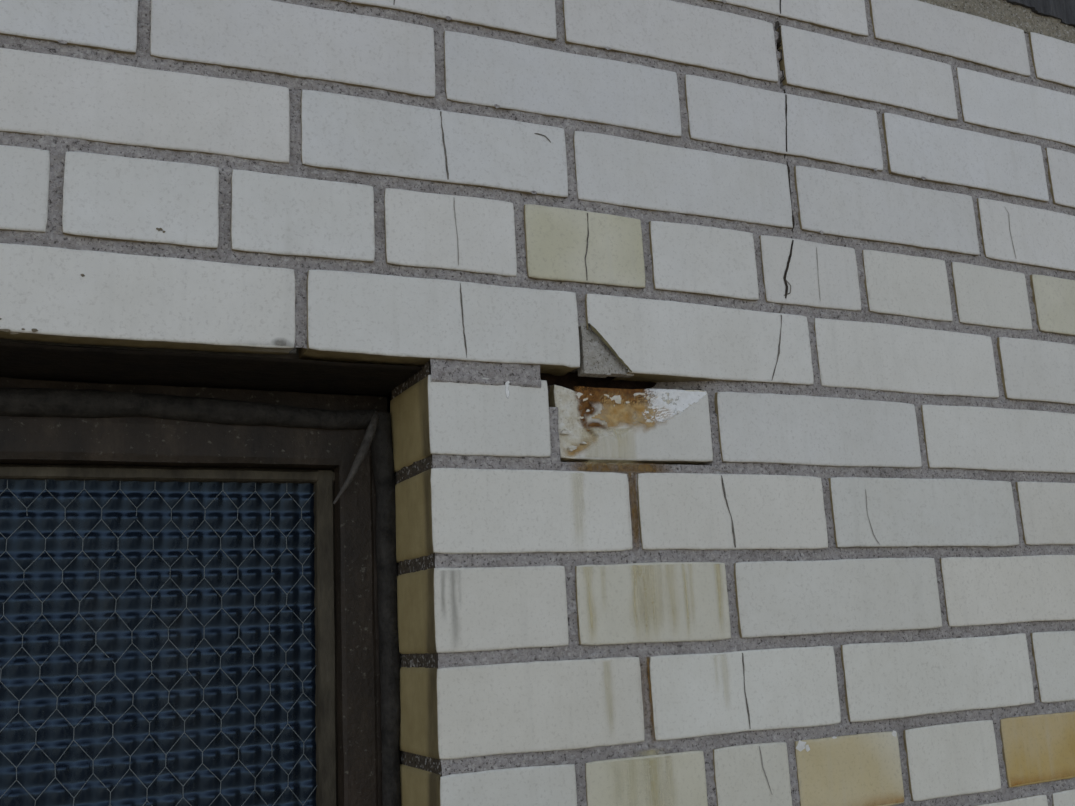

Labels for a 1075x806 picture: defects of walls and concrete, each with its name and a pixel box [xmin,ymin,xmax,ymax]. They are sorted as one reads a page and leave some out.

crack [439,109,467,357]
crack [583,213,591,286]
crack [772,0,821,380]
spalling [548,318,713,465]
crack [721,475,736,548]
crack [740,649,772,794]